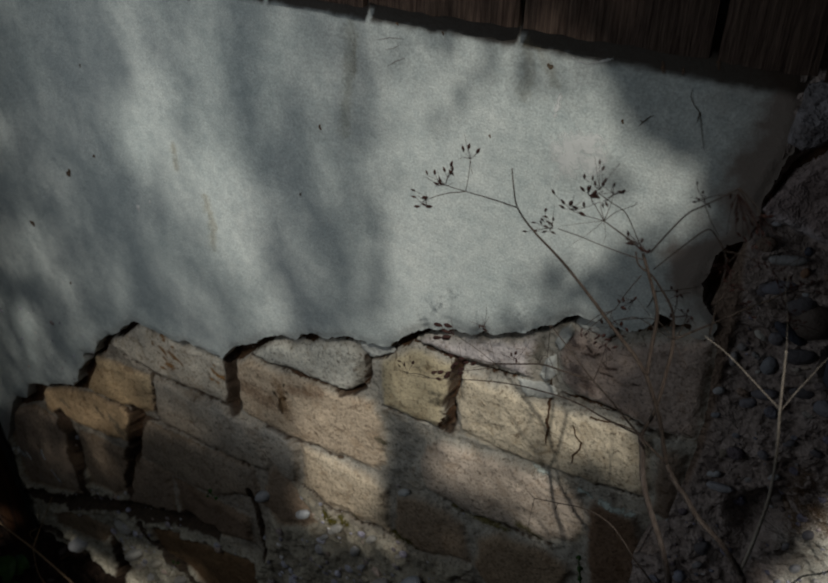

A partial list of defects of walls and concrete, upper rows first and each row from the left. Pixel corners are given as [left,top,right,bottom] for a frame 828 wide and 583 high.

peeling [518,316,619,398]